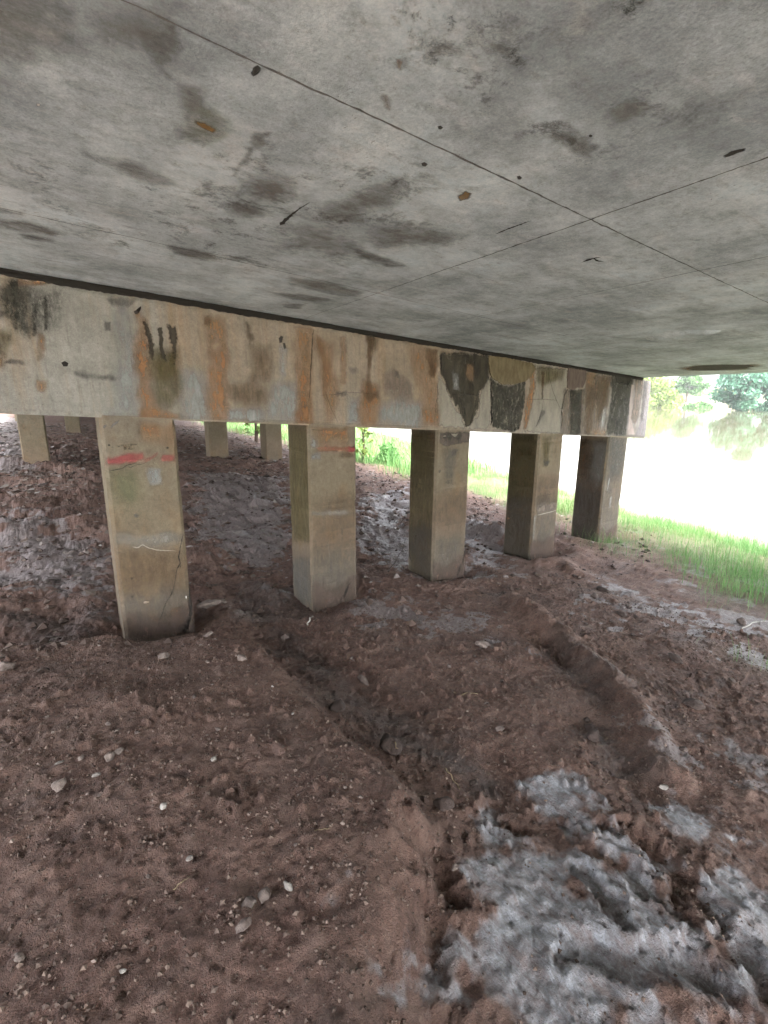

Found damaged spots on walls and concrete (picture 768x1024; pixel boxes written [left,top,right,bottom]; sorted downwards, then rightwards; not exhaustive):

corrosion [134,306,178,418]
leakage [143,321,178,377]
corrosion [296,329,346,424]
corrosion [358,337,379,424]
leakage [440,352,489,427]
leakage [572,373,631,537]
crack [158,534,193,633]